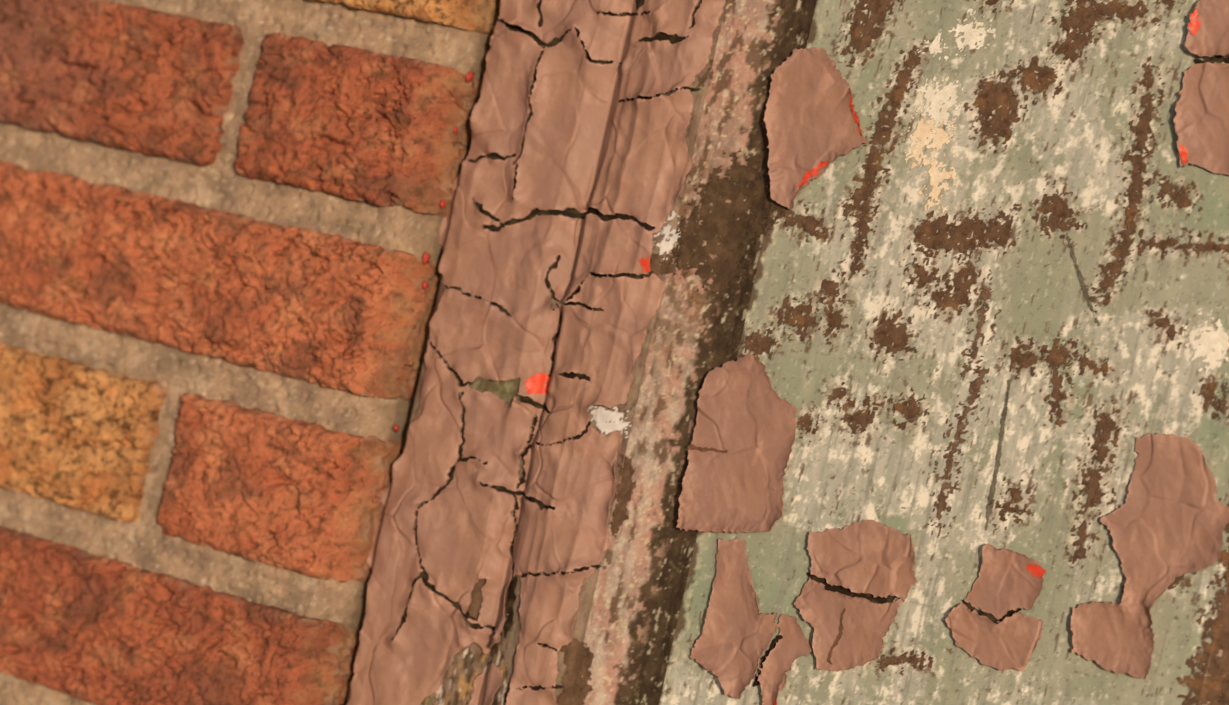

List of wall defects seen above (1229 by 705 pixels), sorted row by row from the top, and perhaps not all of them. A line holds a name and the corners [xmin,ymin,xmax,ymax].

crack [470,111,656,232]
crack [499,0,702,81]
peeling [763,47,868,209]
spalling [901,9,996,219]
peeling [1174,0,1229,176]
crack [1194,56,1229,64]
crack [399,255,654,639]
peeling [676,354,918,705]
crack [807,572,900,664]
crack [962,600,1022,624]
peeling [945,543,1046,671]
peeling [1070,433,1229,679]